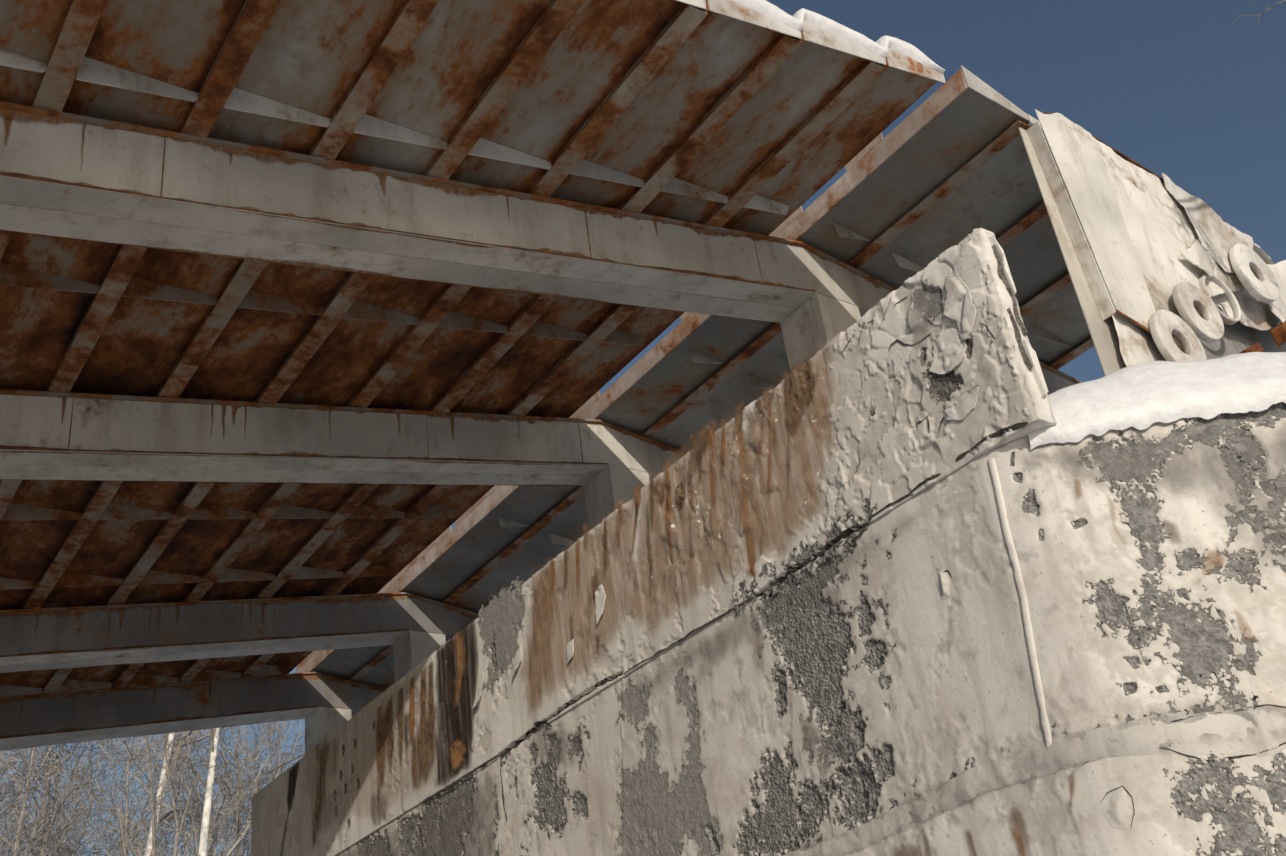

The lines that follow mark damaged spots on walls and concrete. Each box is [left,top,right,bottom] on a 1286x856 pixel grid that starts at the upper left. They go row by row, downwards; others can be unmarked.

rust [4,230,675,311]
rust [0,108,892,293]
crack [842,296,931,352]
peeling [910,273,996,402]
crack [992,244,1033,370]
rust [0,618,477,821]
rust [0,354,830,707]
crack [420,385,1028,856]
spalling [614,498,920,856]
spalling [1079,402,1286,724]
crack [1153,704,1286,777]
spalling [1163,747,1286,856]